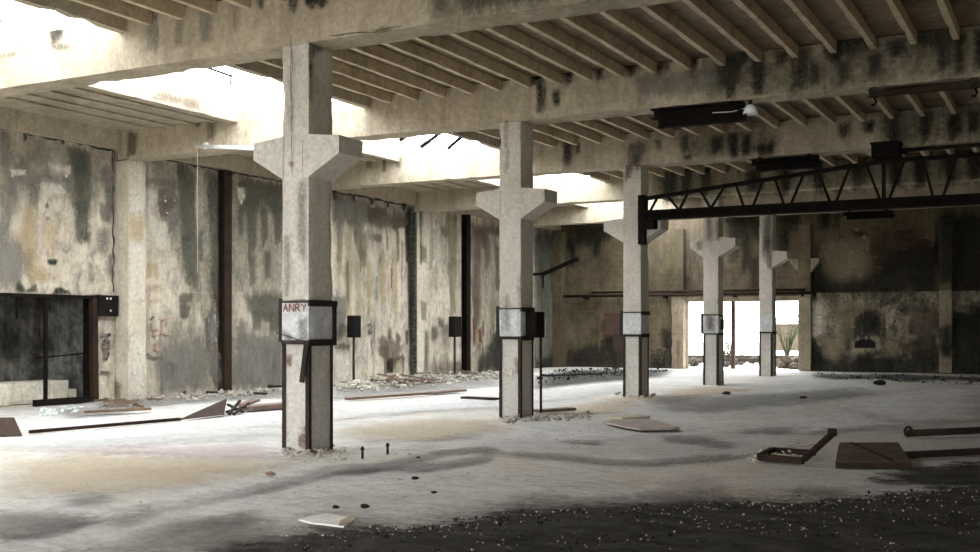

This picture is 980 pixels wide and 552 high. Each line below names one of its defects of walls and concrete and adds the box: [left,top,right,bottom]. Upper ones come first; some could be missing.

leakage [533,76,560,113]
leakage [628,24,980,98]
leakage [626,140,660,177]
leakage [657,103,980,203]
leakage [0,133,114,286]
crack [4,129,115,292]
leakage [148,164,218,392]
leakage [333,191,462,376]
leakage [812,263,830,293]
leakage [812,308,952,373]